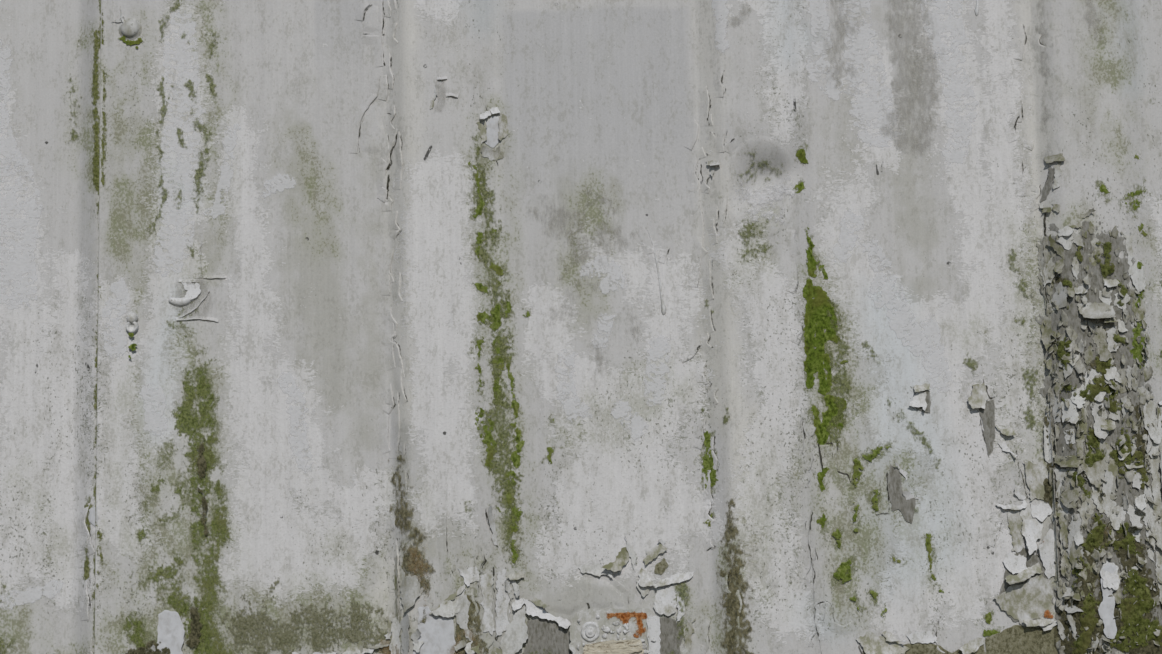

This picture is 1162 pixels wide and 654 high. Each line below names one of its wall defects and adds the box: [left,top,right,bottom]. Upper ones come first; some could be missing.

peeling [168,240,226,322]
crack [348,0,410,629]
peeling [856,153,1162,654]
leakage [195,438,209,535]
peeling [149,610,185,654]
corrosion [607,611,647,638]
peeling [578,535,696,654]